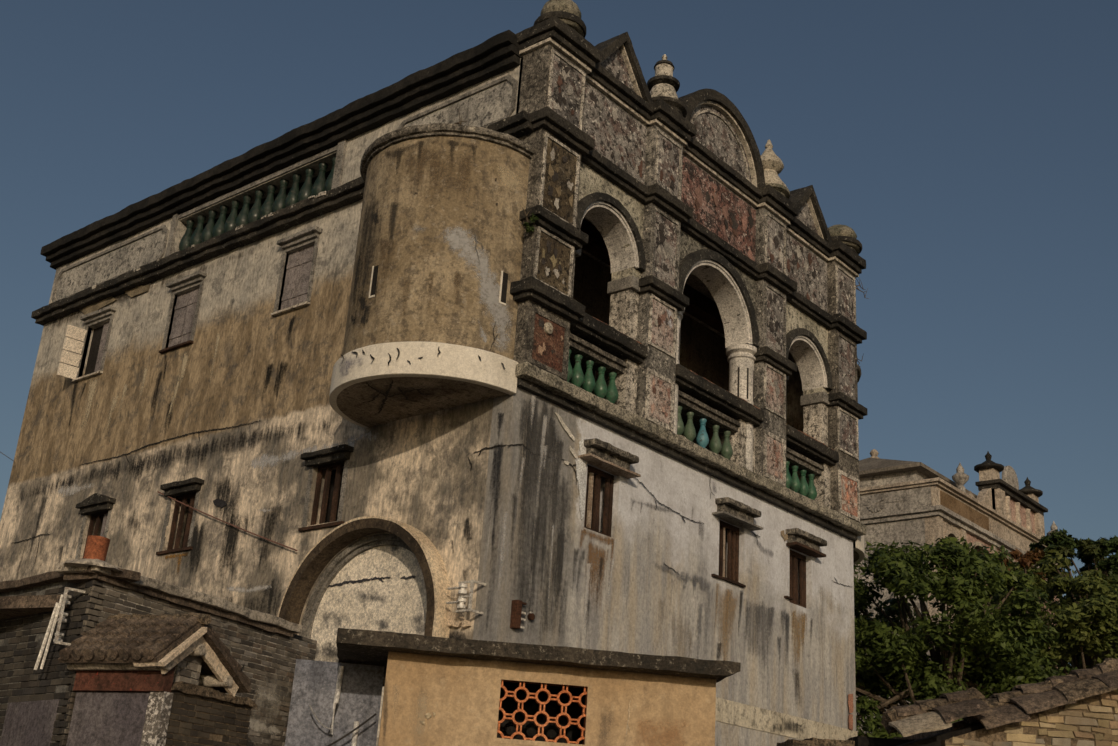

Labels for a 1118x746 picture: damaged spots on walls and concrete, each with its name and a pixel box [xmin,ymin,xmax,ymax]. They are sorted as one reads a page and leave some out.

water stain [385,141,423,169]
water stain [351,202,398,325]
water stain [20,422,376,571]
crack [468,443,577,485]
water stain [491,396,614,628]
crack [637,478,714,524]
water stain [216,477,281,616]
crack [328,575,416,587]
water stain [663,566,710,634]
water stain [738,591,789,657]